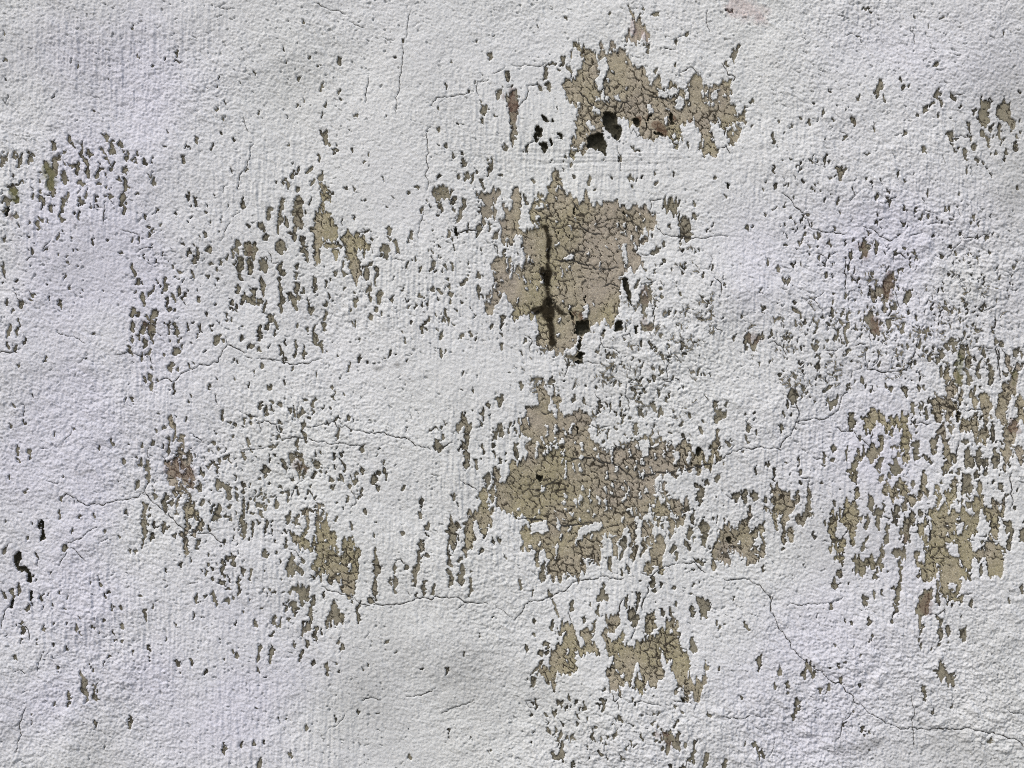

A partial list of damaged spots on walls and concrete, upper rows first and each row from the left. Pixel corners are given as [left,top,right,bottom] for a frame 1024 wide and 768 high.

peeling [771,91,860,148]
peeling [873,79,886,103]
peeling [916,88,1021,177]
peeling [0,133,157,368]
leakage [532,225,564,346]
crack [259,420,431,450]
peeling [122,5,823,768]
peeling [732,153,1024,651]
crack [58,482,225,566]
crack [322,561,1023,746]
peeling [773,659,847,721]